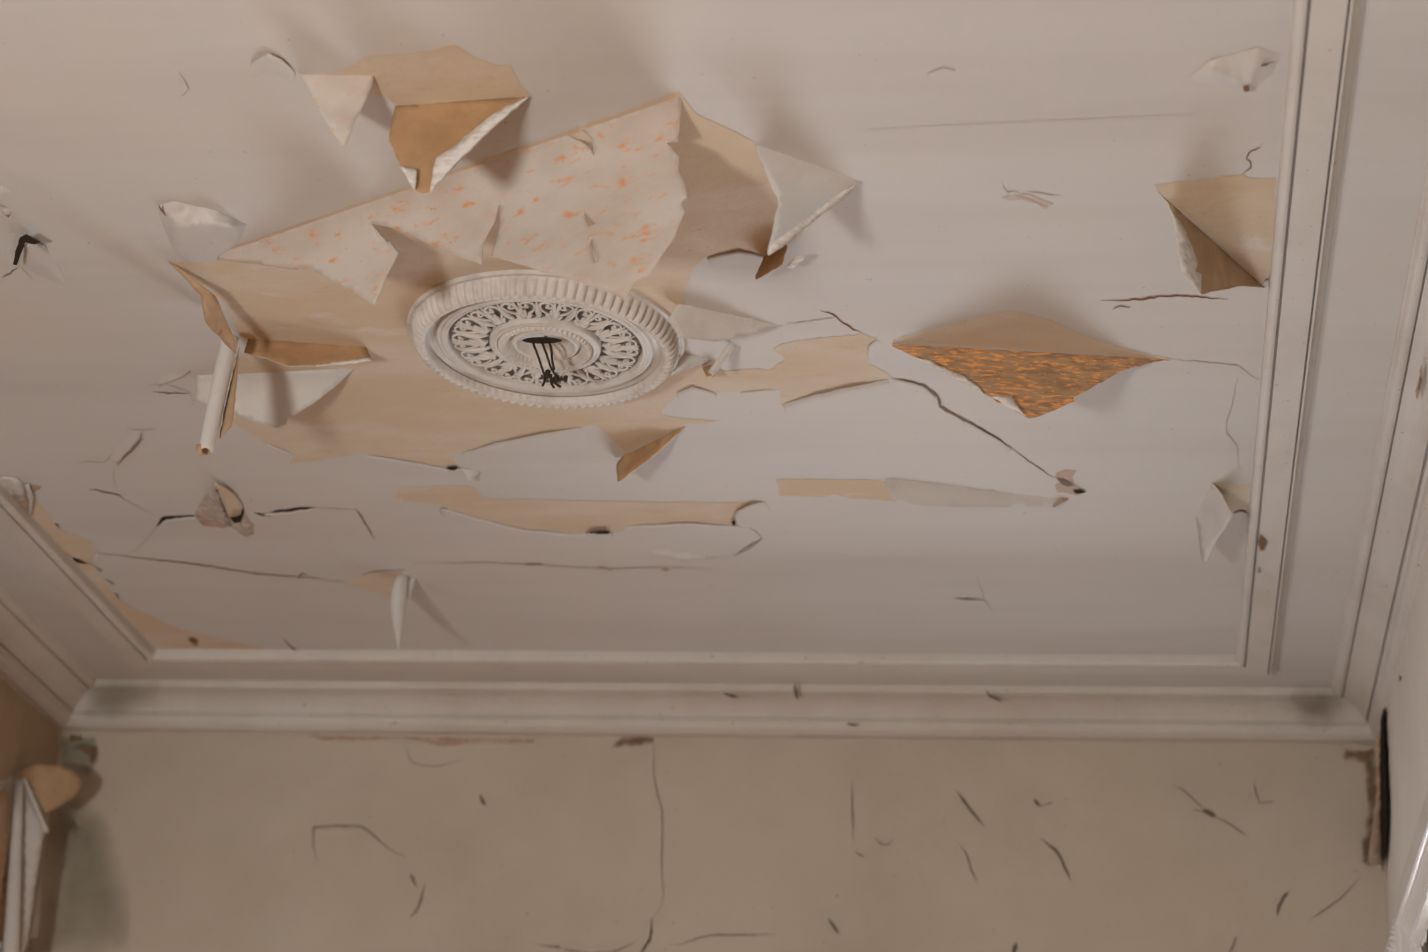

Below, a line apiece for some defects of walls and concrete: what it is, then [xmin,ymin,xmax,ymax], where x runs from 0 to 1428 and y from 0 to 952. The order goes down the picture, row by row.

peeling [3,234,72,291]
peeling [169,45,1174,552]
peeling [1154,147,1276,295]
peeling [0,476,265,650]
crack [89,467,341,582]
crack [256,507,375,539]
peeling [1196,482,1251,564]
peeling [0,765,83,952]
crack [535,748,771,952]